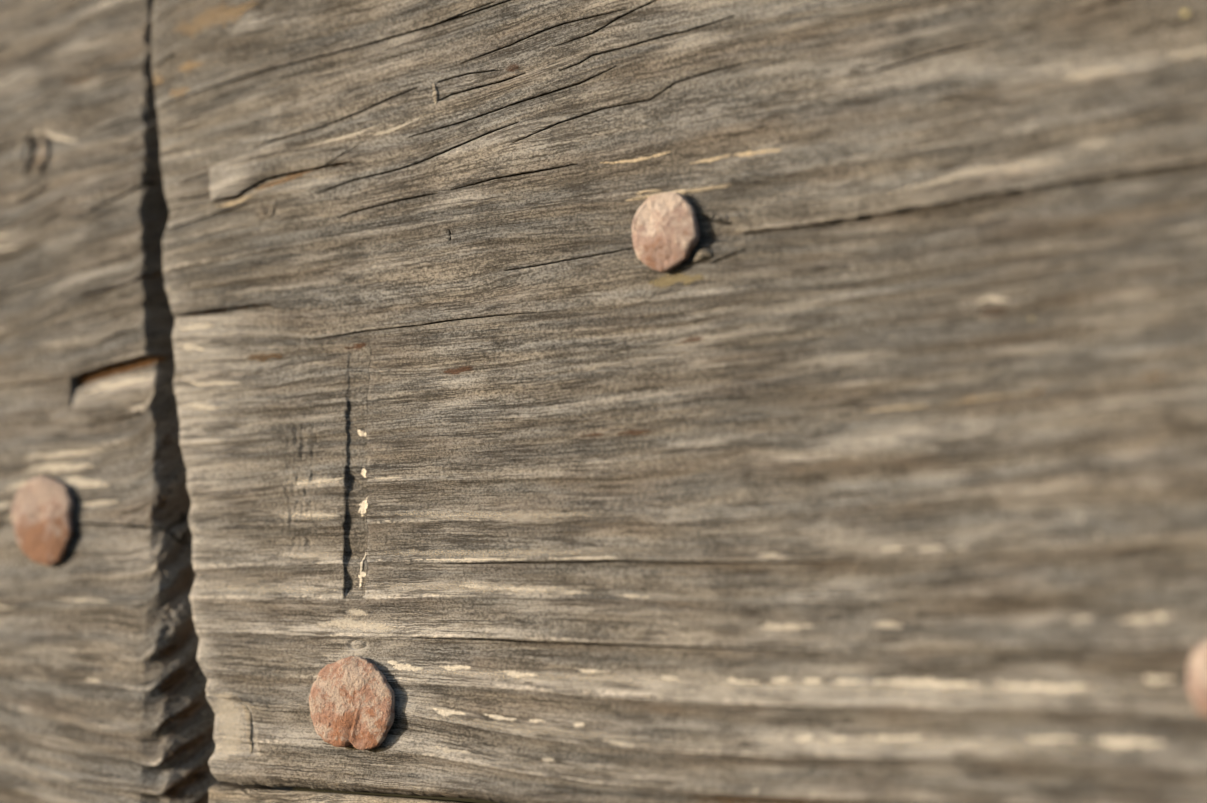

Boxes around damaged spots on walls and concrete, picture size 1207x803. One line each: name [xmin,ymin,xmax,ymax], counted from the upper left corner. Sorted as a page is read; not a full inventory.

crack [0,0,750,260]
crack [505,248,634,271]
crack [175,304,271,317]
crack [78,512,192,545]